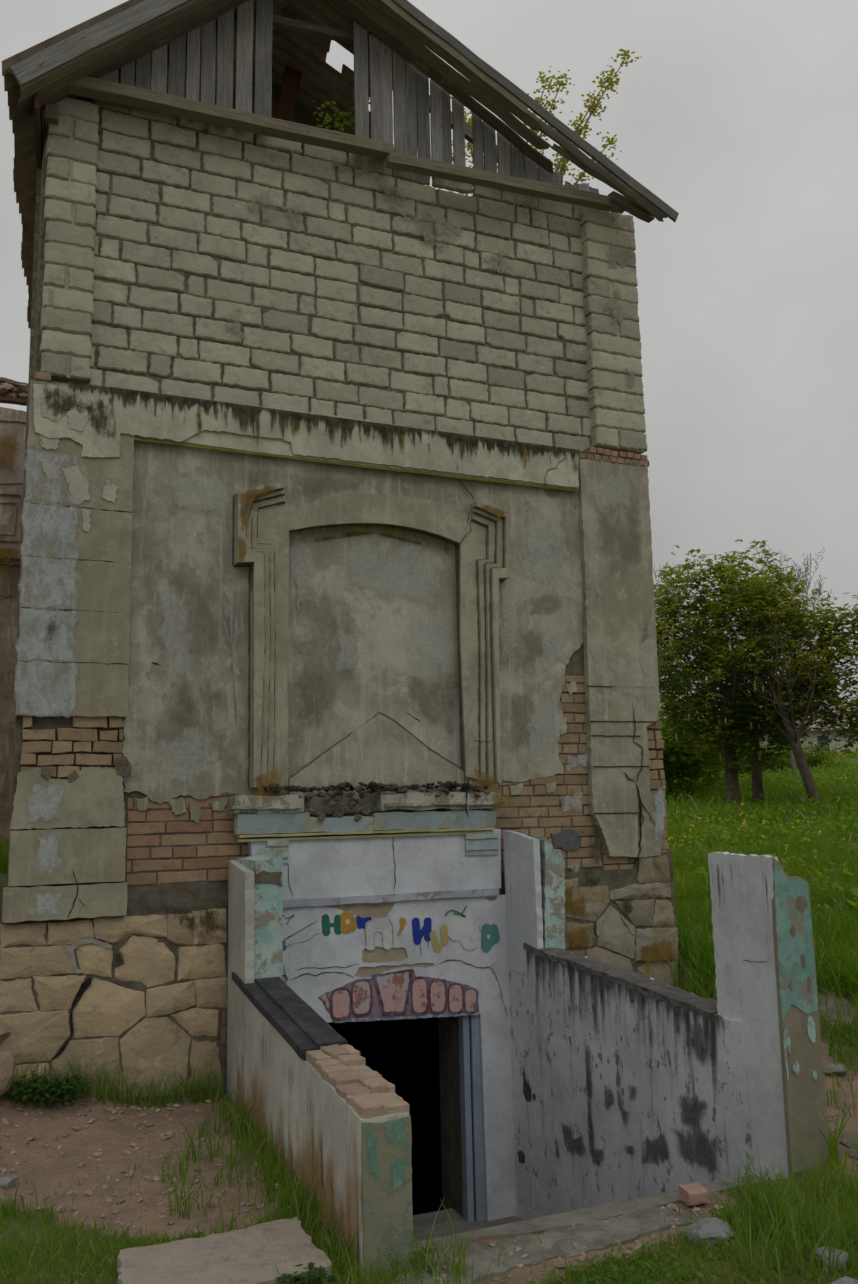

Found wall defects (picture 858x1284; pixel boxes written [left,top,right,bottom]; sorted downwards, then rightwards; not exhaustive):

leakage [162,400,228,432]
leakage [291,420,412,448]
peeling [0,395,118,717]
peeling [28,766,78,873]
spalling [114,756,132,777]
spalling [169,797,227,823]
crack [623,703,655,878]
crack [68,869,86,917]
peeling [774,861,818,1084]
crack [50,977,91,1061]
leakage [523,1071,535,1101]
leakage [526,950,725,1173]